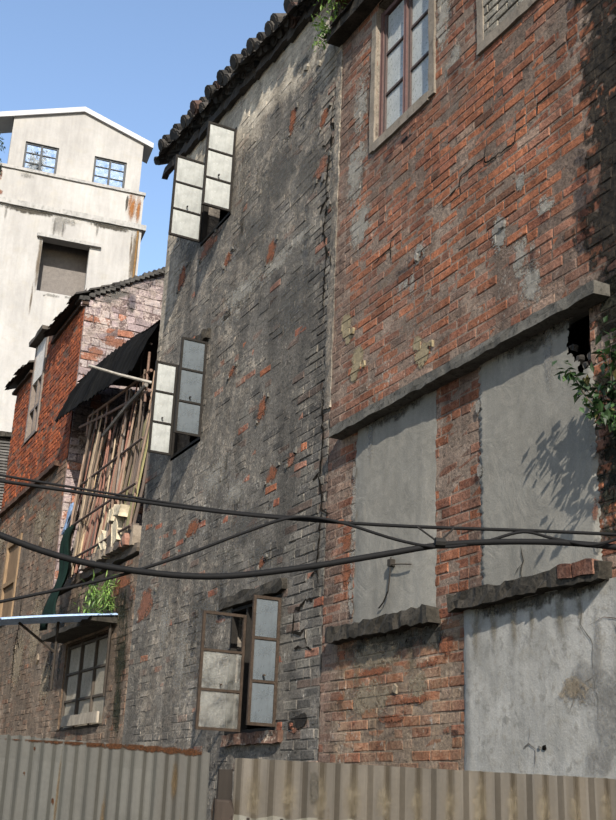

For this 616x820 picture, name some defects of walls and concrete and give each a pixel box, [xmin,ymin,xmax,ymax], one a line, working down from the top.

rust [125,195,141,220]
crack [319,92,336,320]
crack [435,90,553,209]
leakage [567,0,616,334]
spalling [288,713,307,733]
leakage [482,583,600,617]
crack [569,605,616,712]
leakage [572,620,616,772]